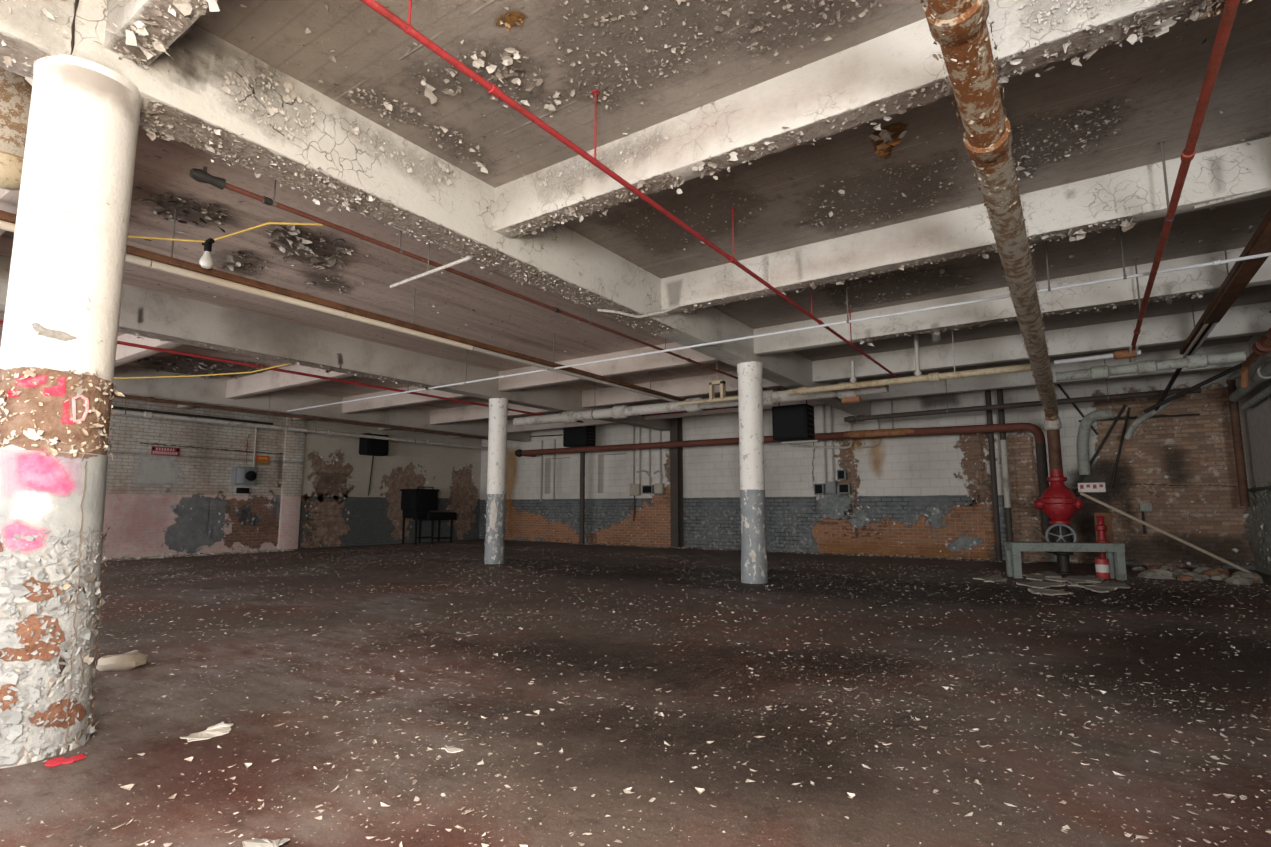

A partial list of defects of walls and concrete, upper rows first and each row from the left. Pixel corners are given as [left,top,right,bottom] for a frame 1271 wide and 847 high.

peeling [94,0,220,69]
crack [235,71,316,139]
peeling [134,0,893,352]
peeling [506,0,1253,411]
peeling [118,327,436,391]
peeling [0,367,125,461]
peeling [162,488,281,554]
peeling [298,449,354,548]
peeling [380,462,429,541]
peeling [444,439,671,554]
peeling [811,431,1051,562]
peeling [1092,355,1271,567]